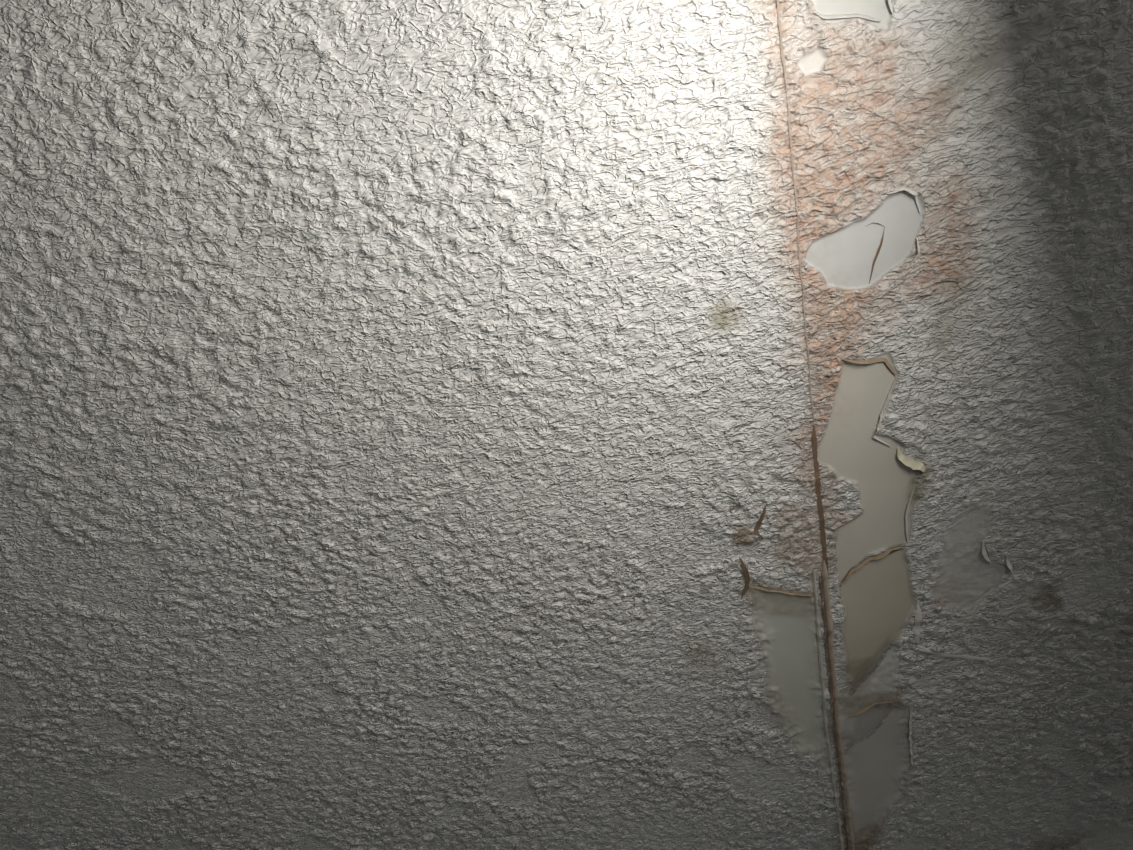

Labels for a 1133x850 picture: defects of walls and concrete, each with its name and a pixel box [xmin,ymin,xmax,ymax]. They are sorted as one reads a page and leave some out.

peeling [796,48,828,75]
peeling [804,187,925,290]
crack [777,0,855,850]
peeling [817,354,926,583]
crack [754,505,767,539]
crack [739,557,770,599]
peeling [831,646,913,844]